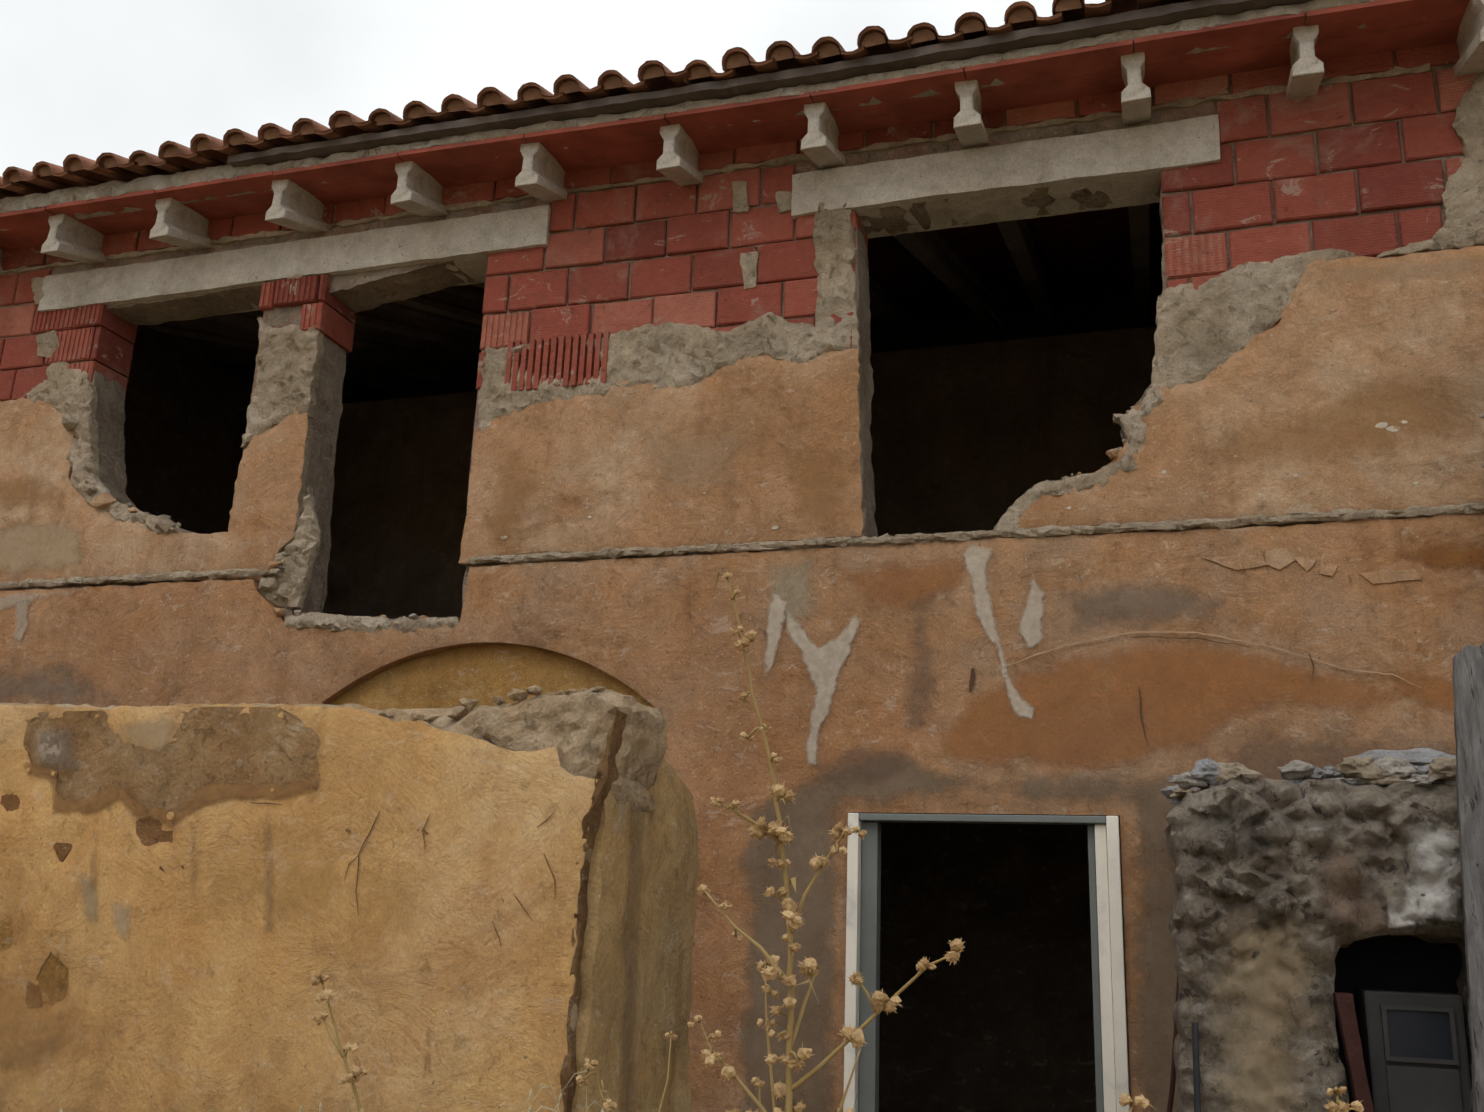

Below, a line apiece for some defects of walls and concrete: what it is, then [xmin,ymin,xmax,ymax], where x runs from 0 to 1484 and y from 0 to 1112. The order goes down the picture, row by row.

spalling [993,386,1165,538]
spalling [1375,420,1408,432]